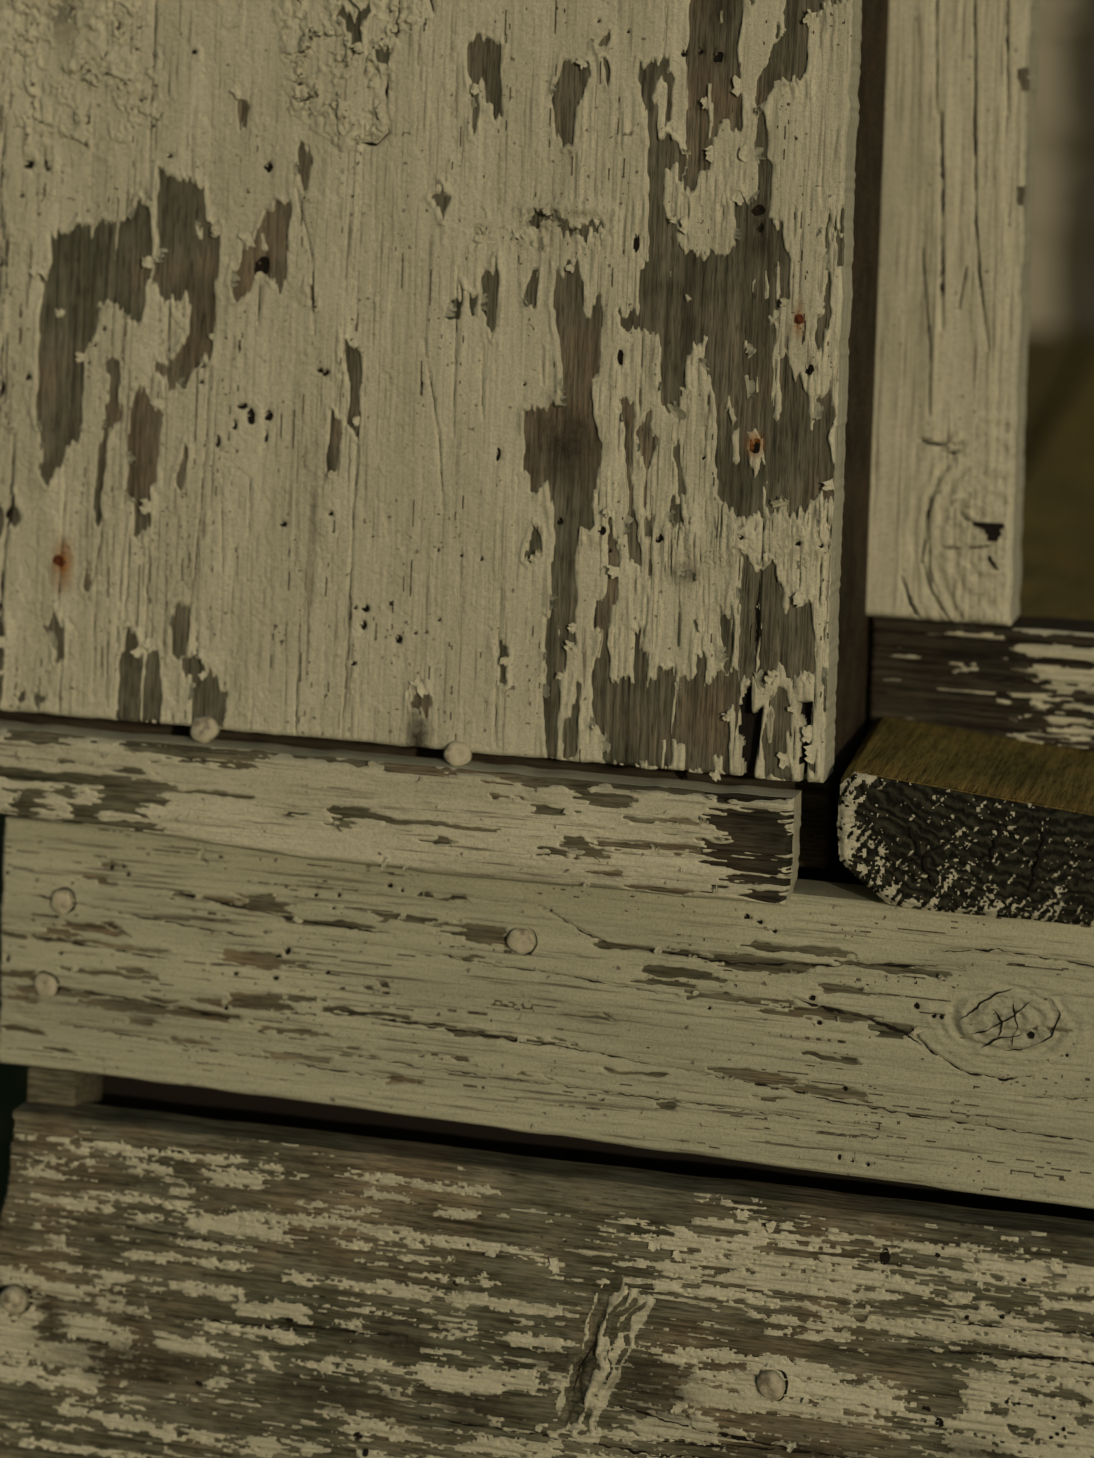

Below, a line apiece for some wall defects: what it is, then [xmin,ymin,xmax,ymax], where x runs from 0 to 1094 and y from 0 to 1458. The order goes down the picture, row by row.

peeling [0,0,847,903]
corrosion [53,548,69,576]
peeling [925,626,1094,748]
peeling [837,772,1094,926]
crack [989,819,1005,862]
peeling [0,966,331,1037]
peeling [221,949,309,971]
crack [3,826,1094,1228]
peeling [594,940,951,1039]
peeling [707,1067,873,1103]
peeling [0,1127,1094,1458]
crack [892,1303,1094,1406]